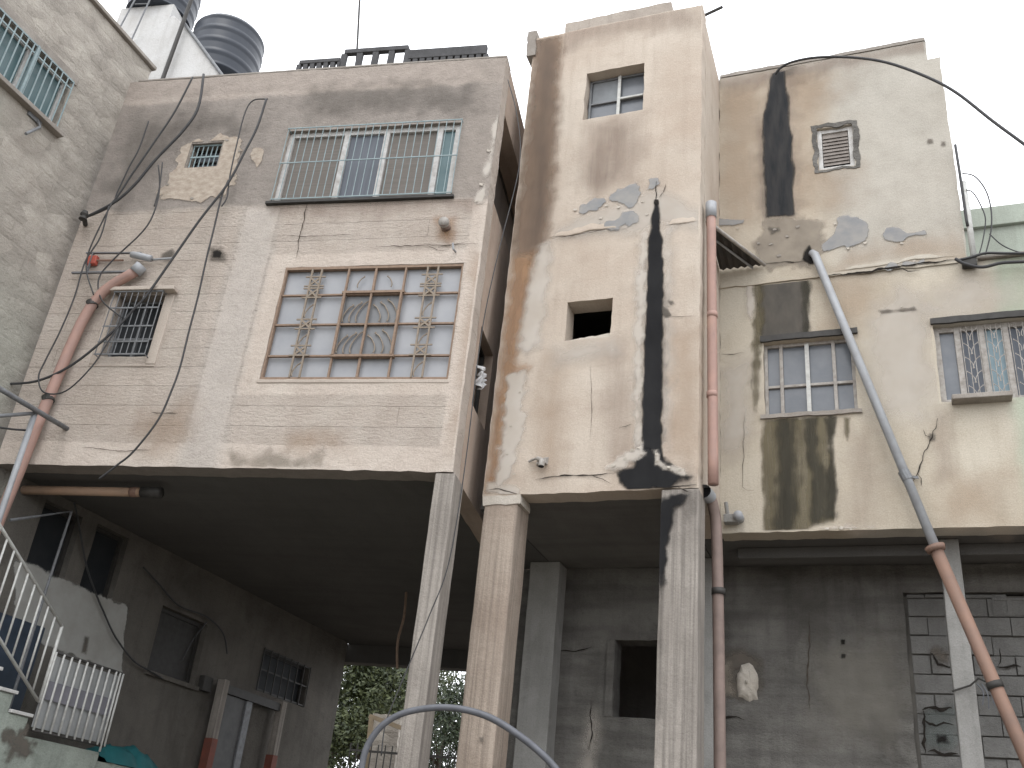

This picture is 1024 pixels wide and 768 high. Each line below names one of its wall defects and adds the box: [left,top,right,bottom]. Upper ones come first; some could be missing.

peeling [156,133,264,203]
crack [289,205,474,257]
water stain [513,36,562,351]
peeling [573,178,660,231]
water stain [763,71,795,217]
peeling [883,227,927,244]
water stain [747,280,810,403]
water stain [617,181,691,586]
crack [489,473,607,494]
water stain [774,416,836,530]
crack [913,418,938,486]
crack [921,706,958,756]